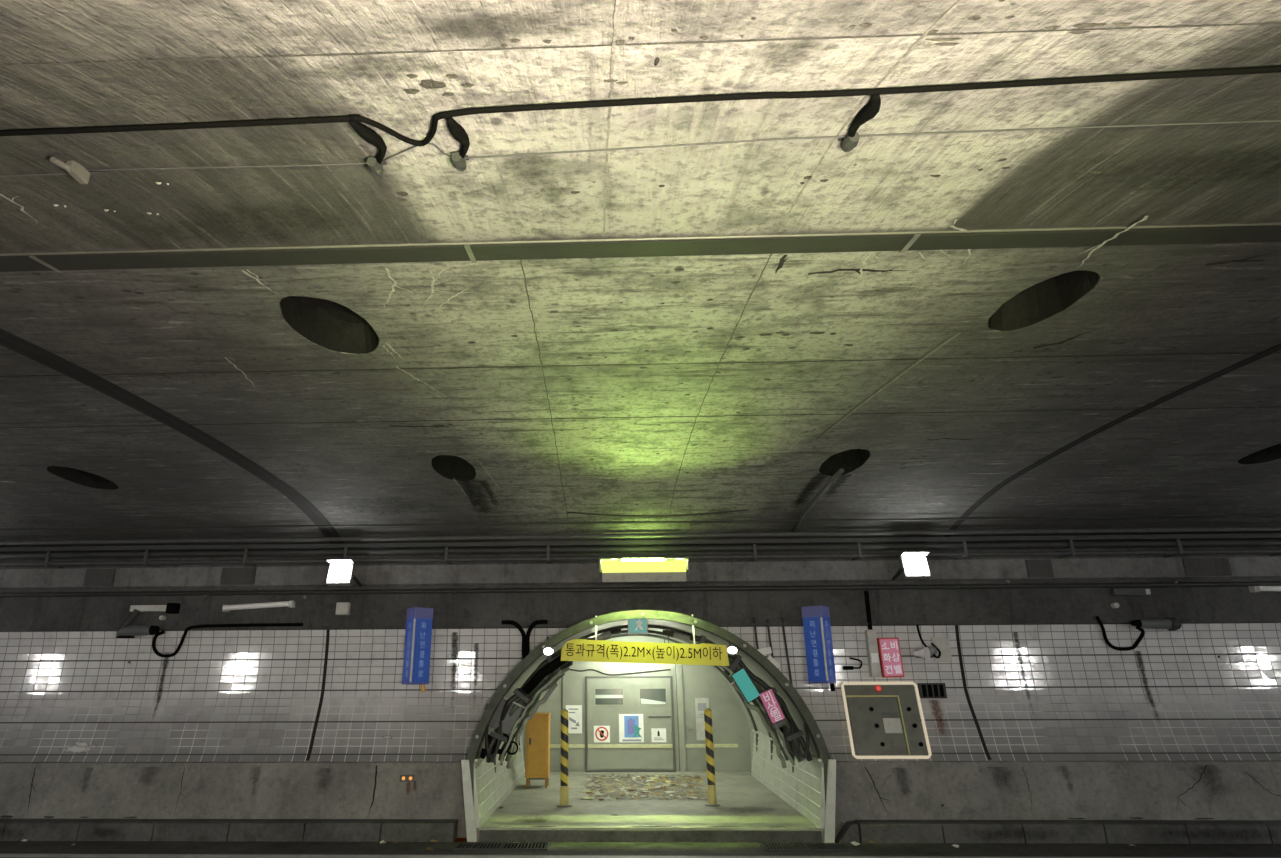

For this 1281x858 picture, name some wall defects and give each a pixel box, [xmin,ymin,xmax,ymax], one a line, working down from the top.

crack [775,219,971,278]
crack [1078,216,1148,268]
water stain [155,653,169,710]
water stain [1014,632,1031,705]
water stain [1136,651,1158,716]